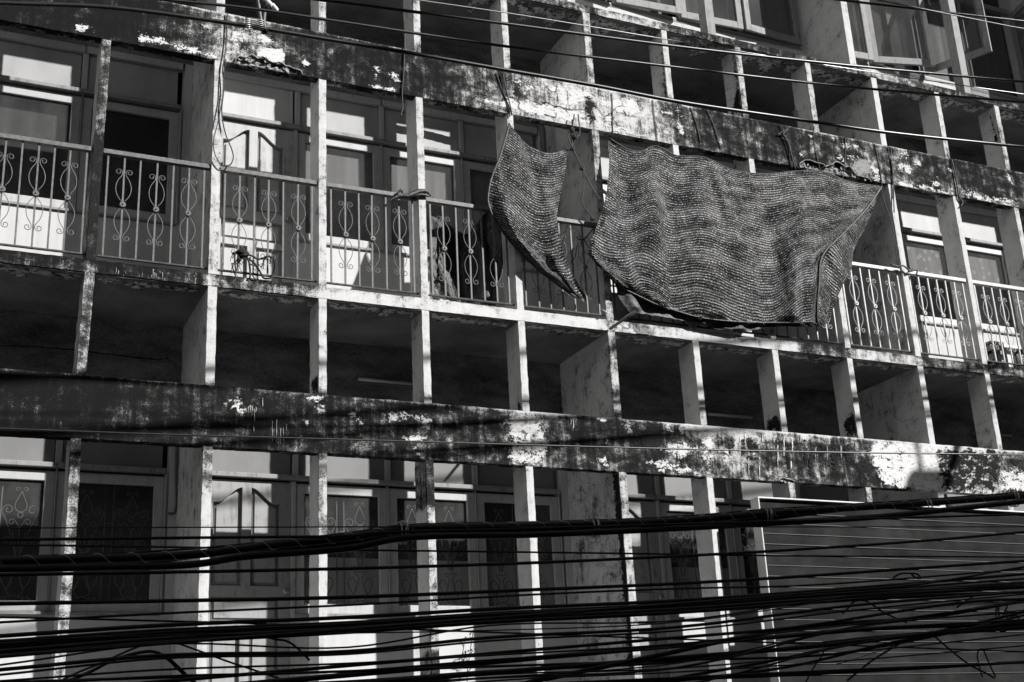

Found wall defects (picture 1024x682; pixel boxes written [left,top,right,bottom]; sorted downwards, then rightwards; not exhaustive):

leakage [583,95,596,124]
leakage [731,55,741,115]
leakage [612,472,621,518]
leakage [639,423,663,448]
leakage [717,411,880,486]
peeling [870,440,944,491]
leakage [936,446,1002,493]
leakage [617,534,628,601]